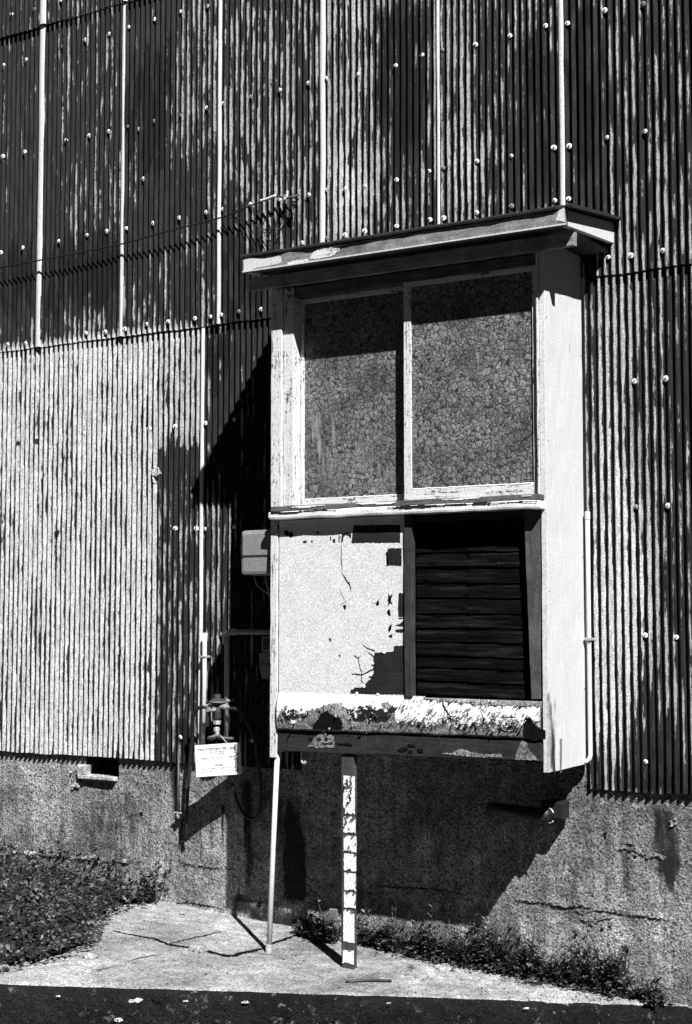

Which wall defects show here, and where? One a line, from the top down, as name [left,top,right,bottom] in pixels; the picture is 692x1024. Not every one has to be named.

crack [340,534,351,603]
peeling [395,593,404,633]
peeling [277,646,540,733]
crack [515,900,677,924]